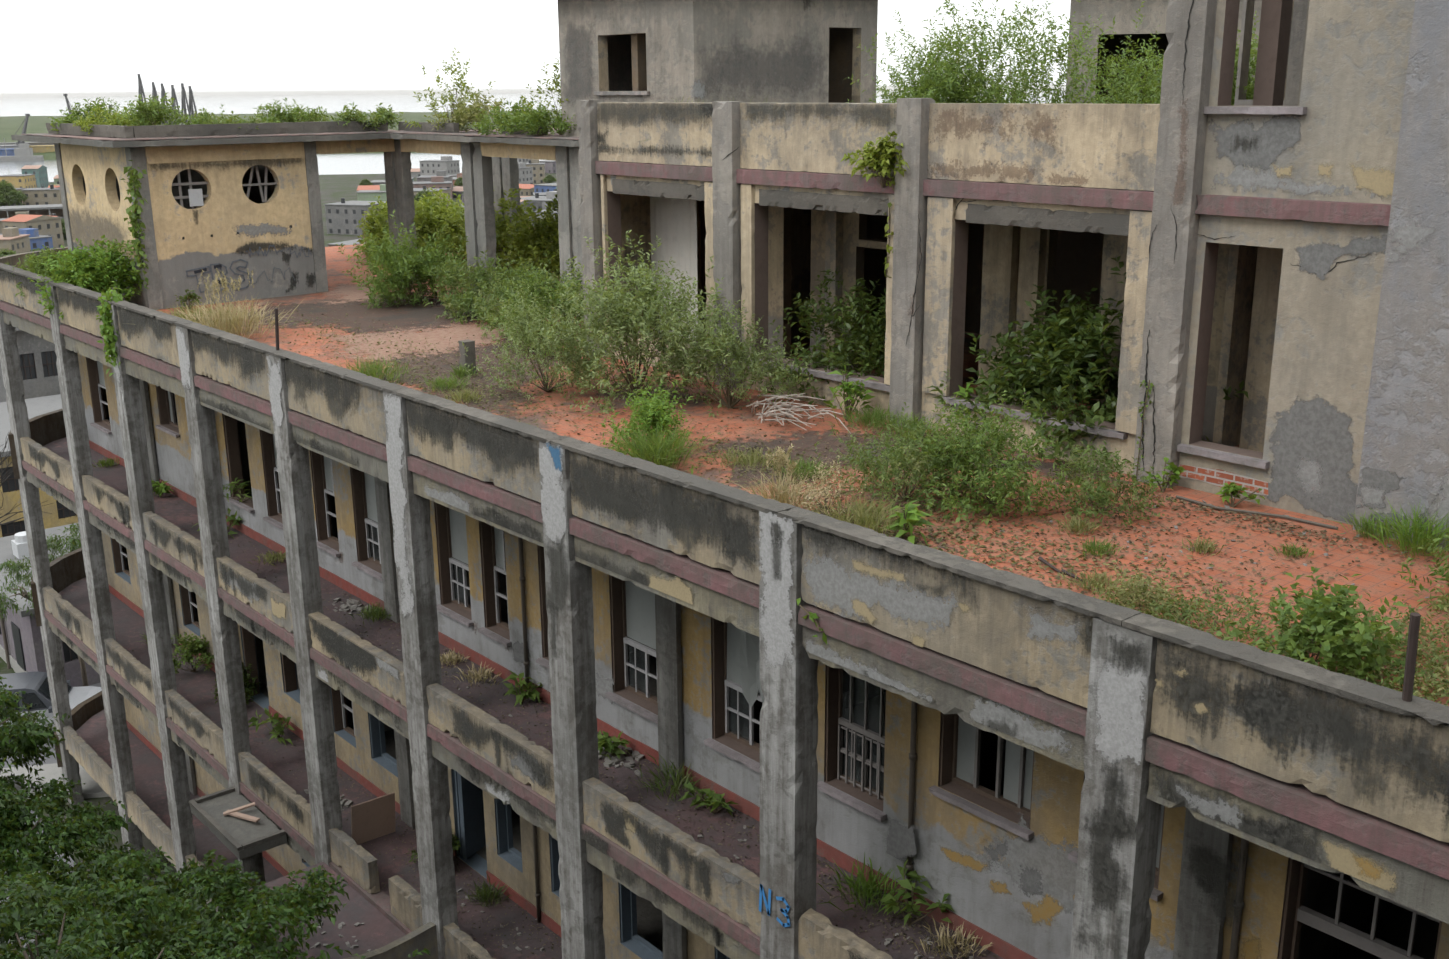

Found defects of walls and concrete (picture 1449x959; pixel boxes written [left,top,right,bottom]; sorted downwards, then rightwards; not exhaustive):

damp [566,25,895,156]
crack [1182,0,1194,105]
peeling [1209,114,1301,177]
crack [1149,210,1233,261]
crack [1291,254,1369,274]
peeling [1296,234,1387,280]
damp [190,330,265,380]
damp [284,359,360,419]
damp [569,454,782,579]
damp [1110,636,1449,819]
damp [1152,768,1322,861]
damp [1077,766,1136,959]